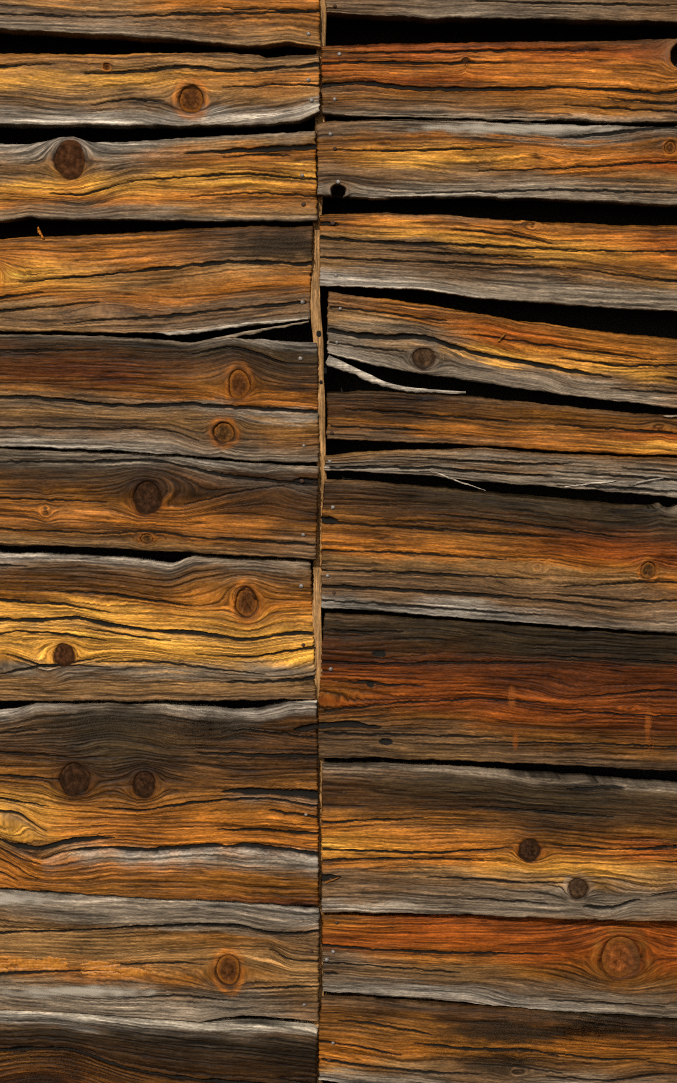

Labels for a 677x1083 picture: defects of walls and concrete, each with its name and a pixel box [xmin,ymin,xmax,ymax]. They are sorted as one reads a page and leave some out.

crack [84,49,677,138]
crack [50,145,317,197]
crack [343,147,677,194]
crack [0,222,677,394]
crack [0,1046,263,1083]
crack [320,1020,677,1081]